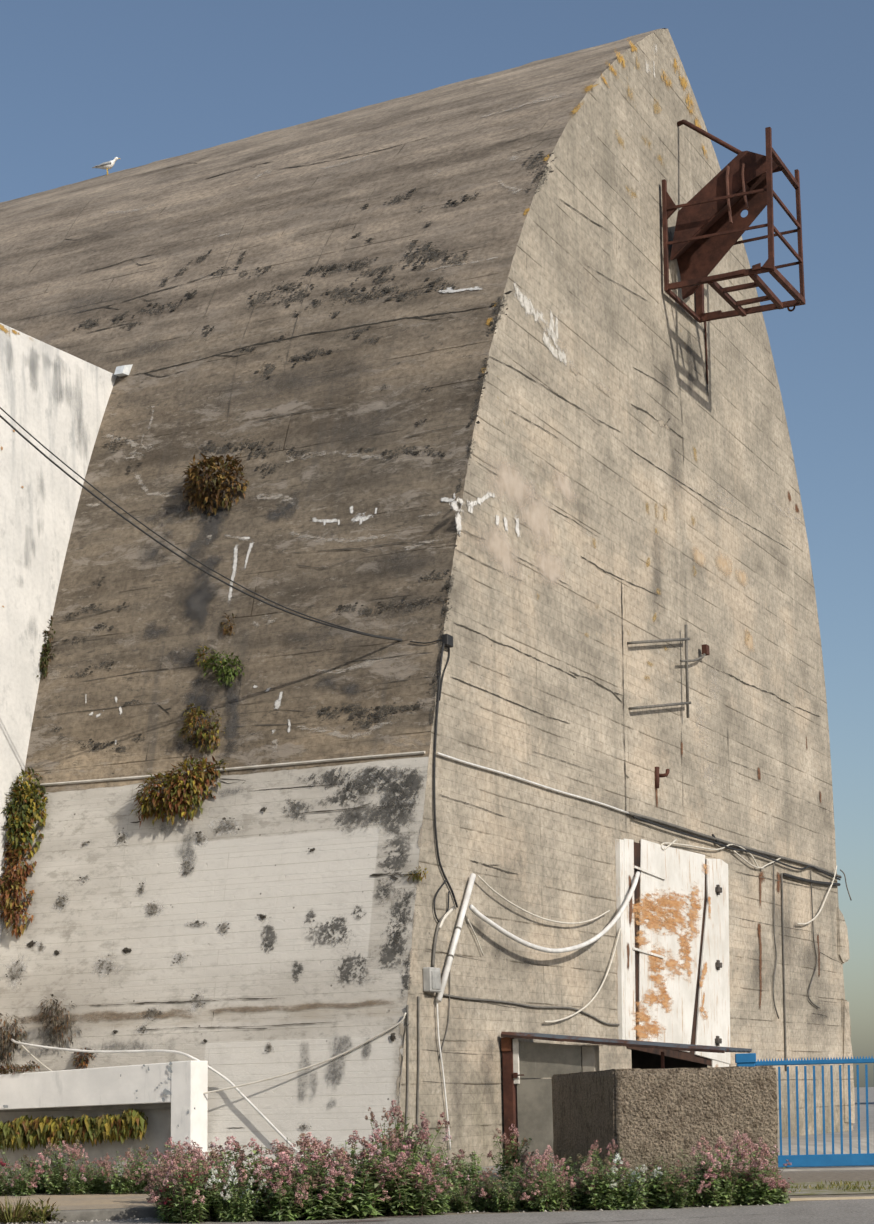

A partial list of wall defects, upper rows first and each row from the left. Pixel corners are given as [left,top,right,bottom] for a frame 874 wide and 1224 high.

leakage [283,799,310,820]
leakage [299,767,421,996]
leakage [261,925,276,952]
corrosion [627,876,711,1041]
leakage [214,1000,384,1013]
leakage [22,1009,187,1057]